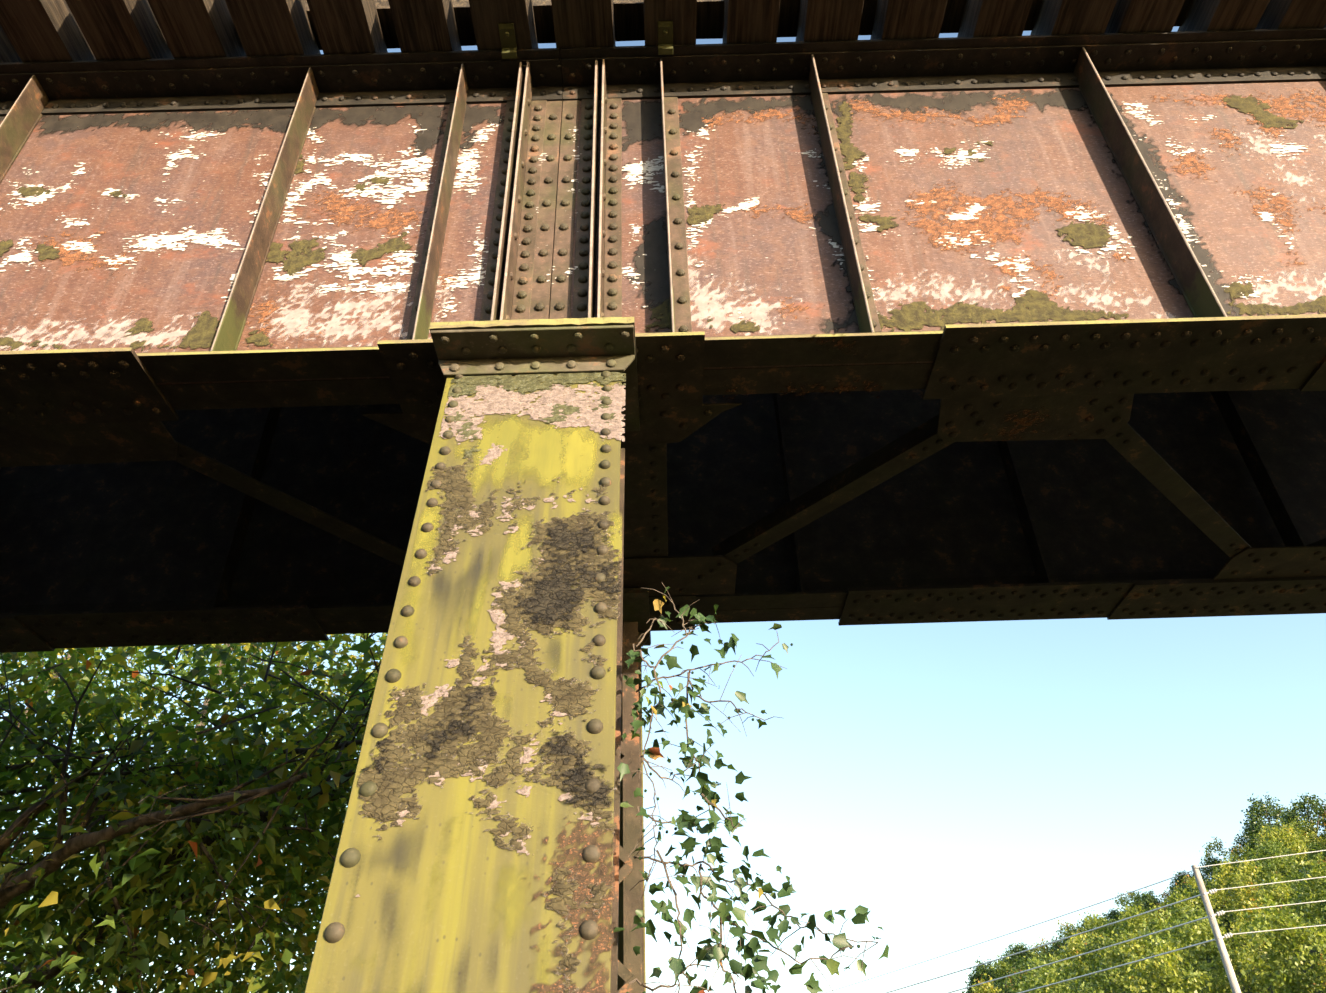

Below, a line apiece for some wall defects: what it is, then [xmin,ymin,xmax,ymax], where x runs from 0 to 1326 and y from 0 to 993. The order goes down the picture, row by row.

peeling [0,237,45,272]
peeling [0,163,89,211]
peeling [54,127,246,269]
peeling [272,124,436,300]
peeling [686,197,759,275]
rust [745,202,820,224]
peeling [853,191,914,238]
peeling [886,141,997,169]
peeling [935,203,1040,298]
rust [898,180,1111,299]
peeling [1063,206,1148,260]
peeling [357,382,626,855]